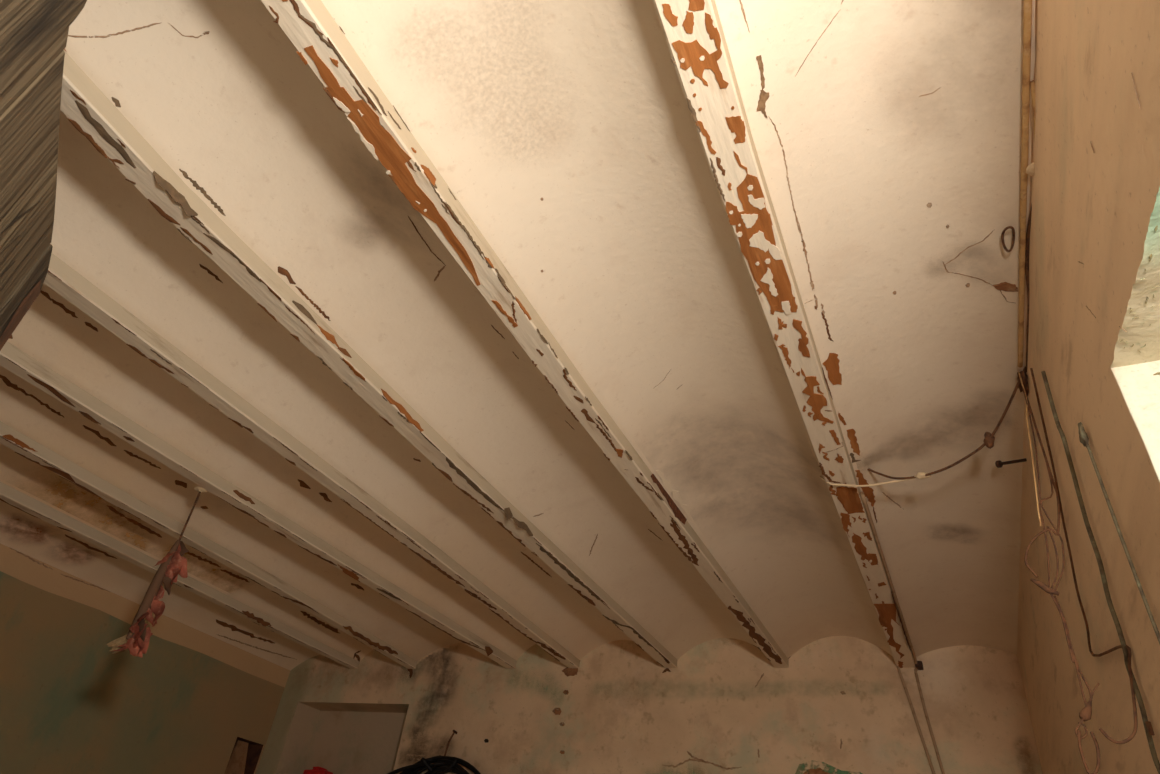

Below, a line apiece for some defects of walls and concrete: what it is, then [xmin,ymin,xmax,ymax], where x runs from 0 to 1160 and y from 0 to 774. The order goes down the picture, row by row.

crack [68,22,209,38]
crack [796,0,843,75]
peeling [67,90,136,185]
peeling [148,169,366,390]
peeling [269,0,700,566]
peeling [662,0,910,668]
crack [769,117,825,314]
peeling [379,389,664,667]
peeling [795,760,862,774]